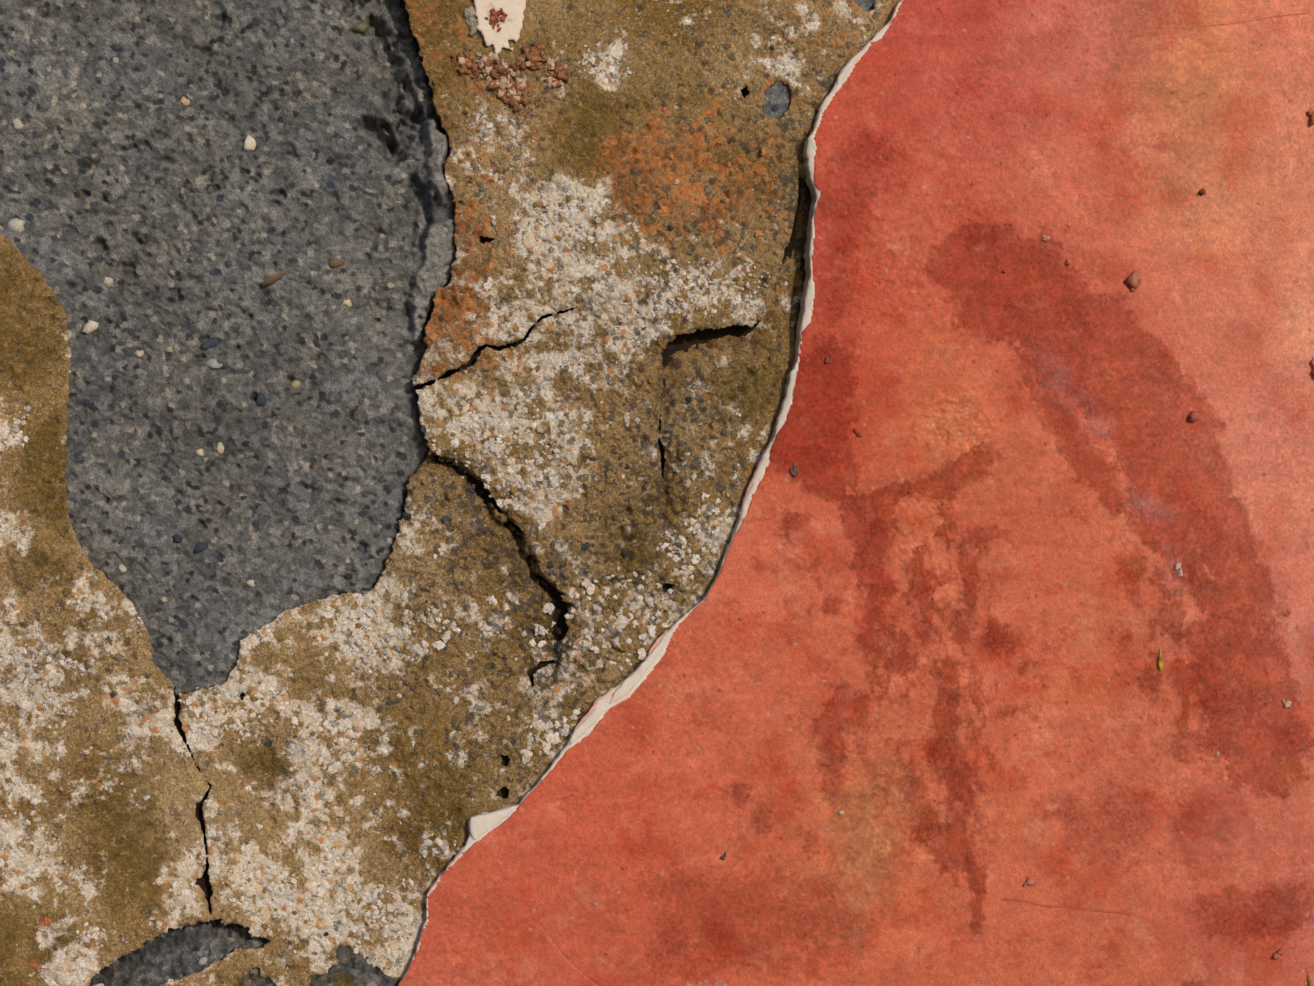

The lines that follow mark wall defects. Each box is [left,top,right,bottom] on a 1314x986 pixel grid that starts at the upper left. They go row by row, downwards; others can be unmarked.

spalling [0,0,457,696]
crack [413,308,575,395]
crack [658,321,759,477]
crack [432,456,522,540]
flaking render [309,0,903,986]
water stain [927,223,1314,798]
crack [527,576,569,684]
water stain [770,334,1029,933]
crack [173,687,217,921]
spalling [87,919,269,986]
spalling [239,967,276,986]
water stain [1197,883,1311,944]